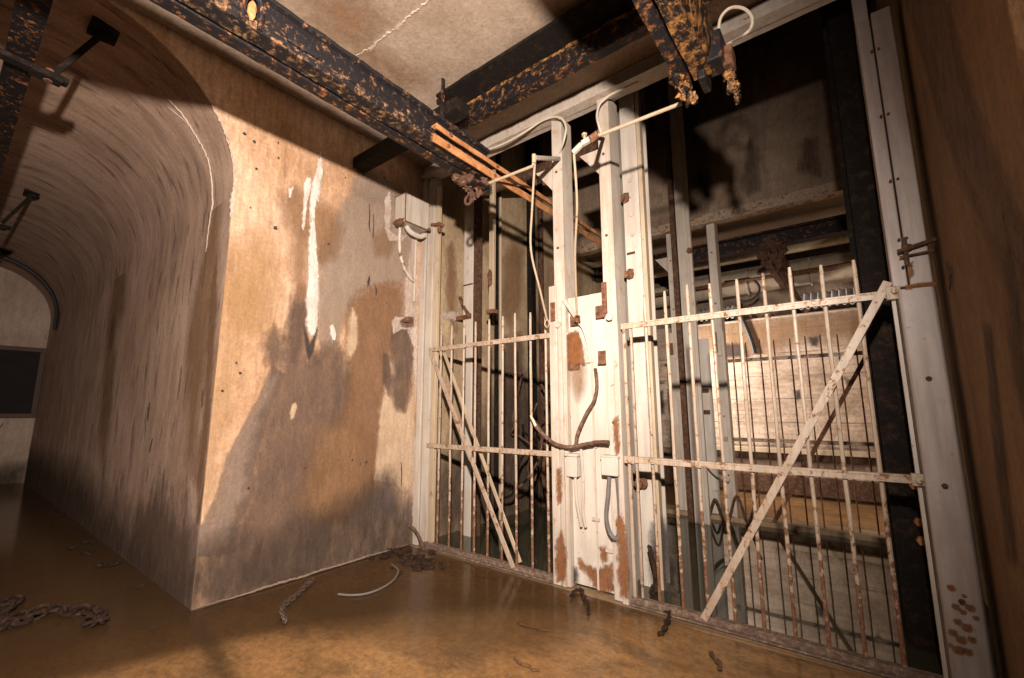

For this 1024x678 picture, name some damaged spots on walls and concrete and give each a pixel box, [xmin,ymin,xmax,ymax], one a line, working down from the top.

rust [224,0,432,133]
crack [356,0,428,56]
water stain [0,149,414,610]
peeling [352,191,419,526]
rust [568,331,585,393]
rust [555,516,630,598]
rust [947,585,979,656]